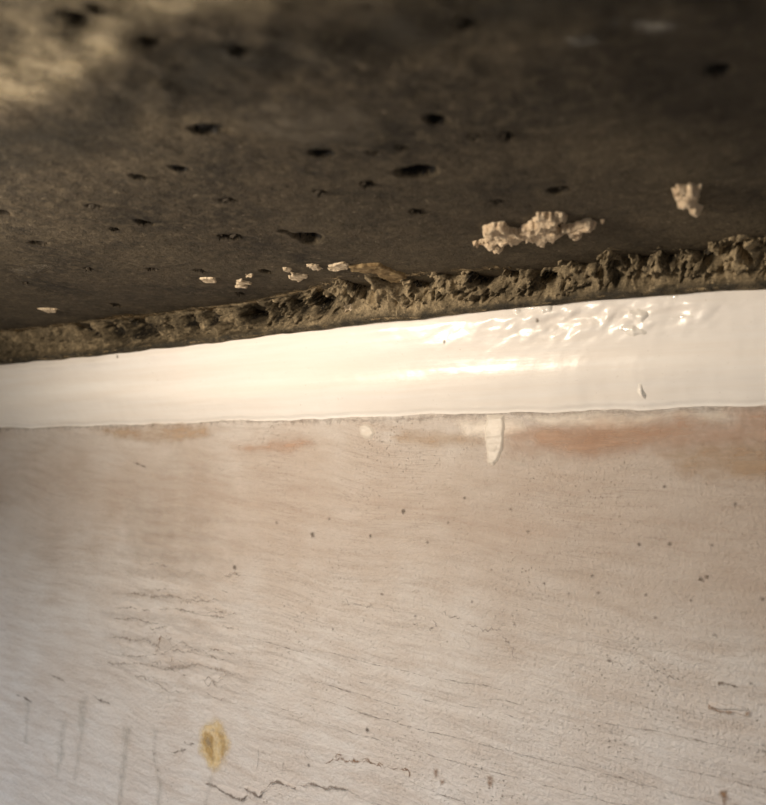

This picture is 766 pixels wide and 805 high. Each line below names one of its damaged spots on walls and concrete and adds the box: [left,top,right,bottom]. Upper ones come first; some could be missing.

peeling [519,211,605,248]
spalling [0,234,766,365]
corrosion [201,722,228,767]